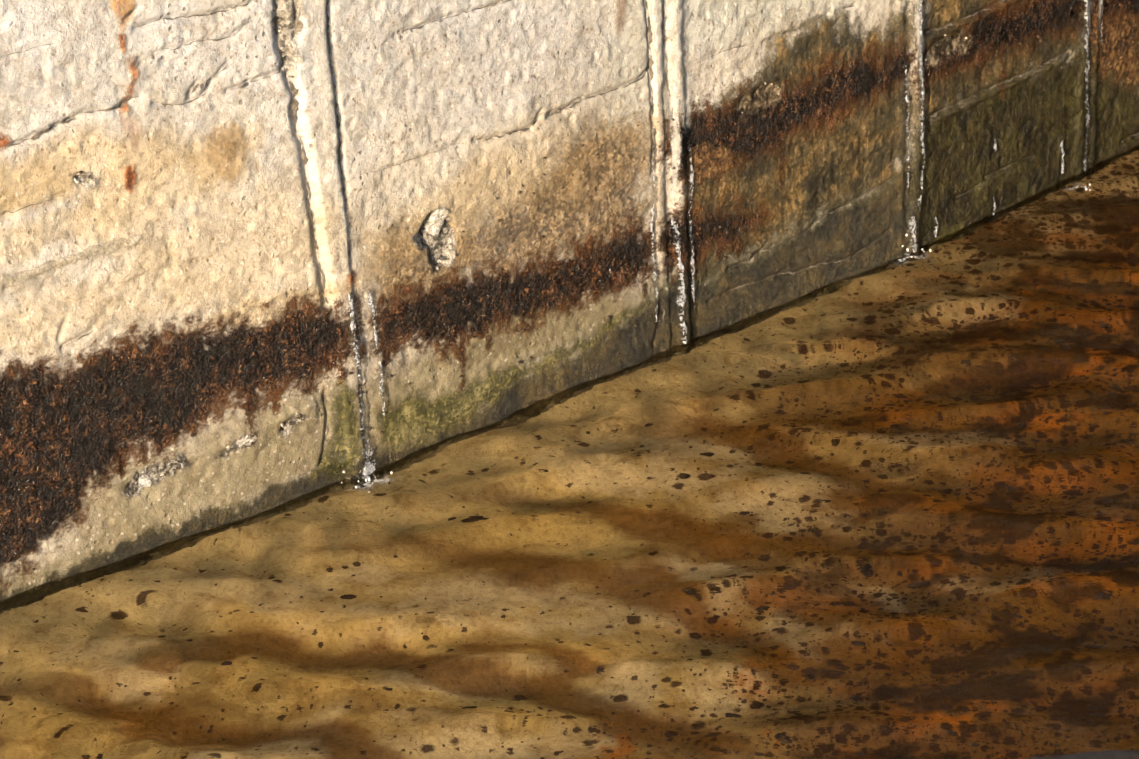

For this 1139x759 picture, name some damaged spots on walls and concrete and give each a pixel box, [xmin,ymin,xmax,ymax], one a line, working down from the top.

corrosion [110,0,139,111]
corrosion [124,164,136,193]
spalling [413,207,457,270]
leakage [0,0,1139,602]